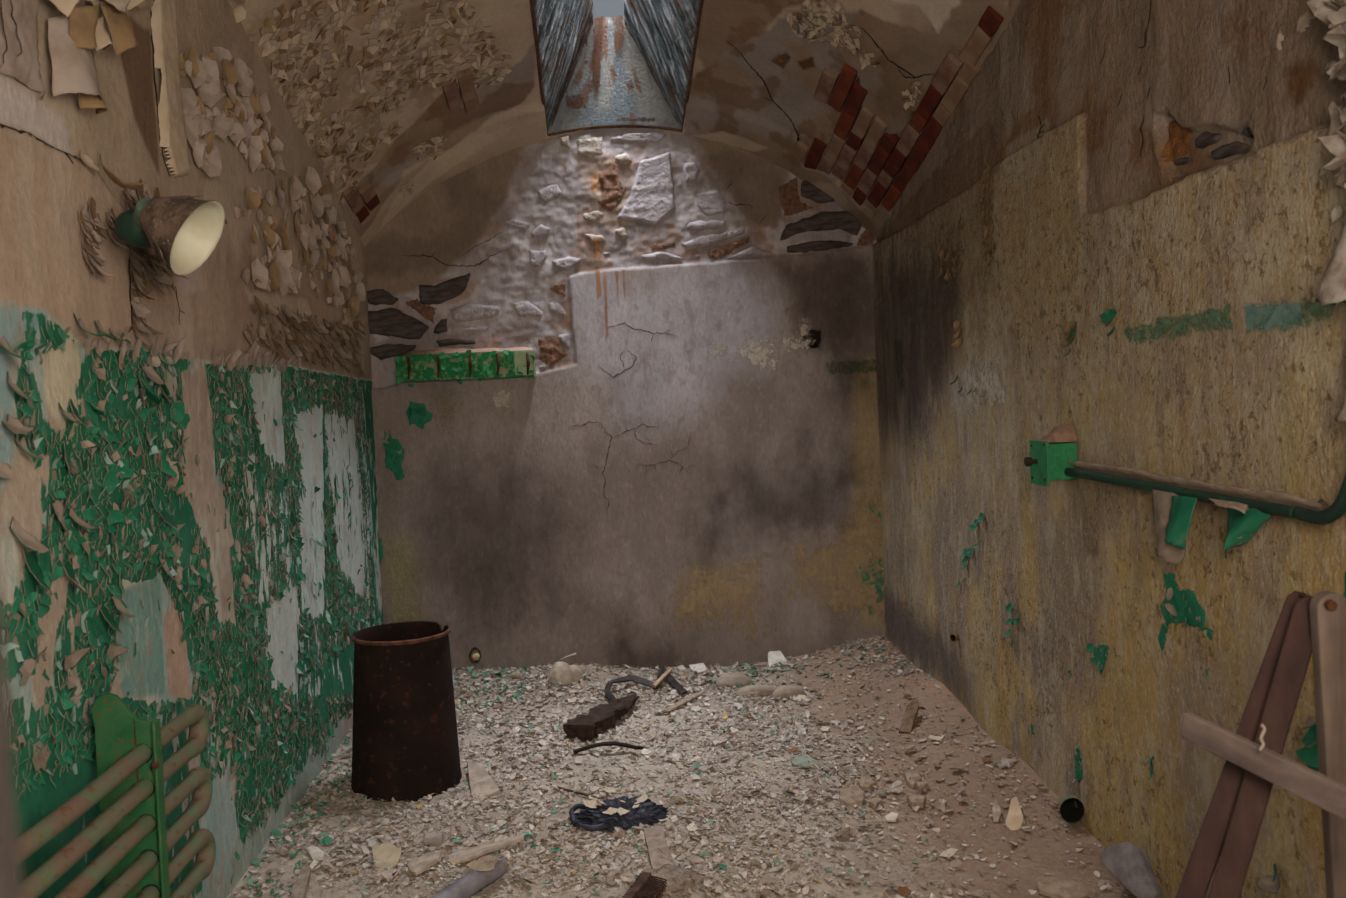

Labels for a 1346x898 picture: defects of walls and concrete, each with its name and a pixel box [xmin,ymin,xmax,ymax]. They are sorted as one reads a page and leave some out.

flaking render [783,0,1004,212]
corrosion [594,239,625,335]
peeling [395,349,535,429]
crack [602,322,678,378]
peeling [0,0,513,884]
crack [567,421,695,521]